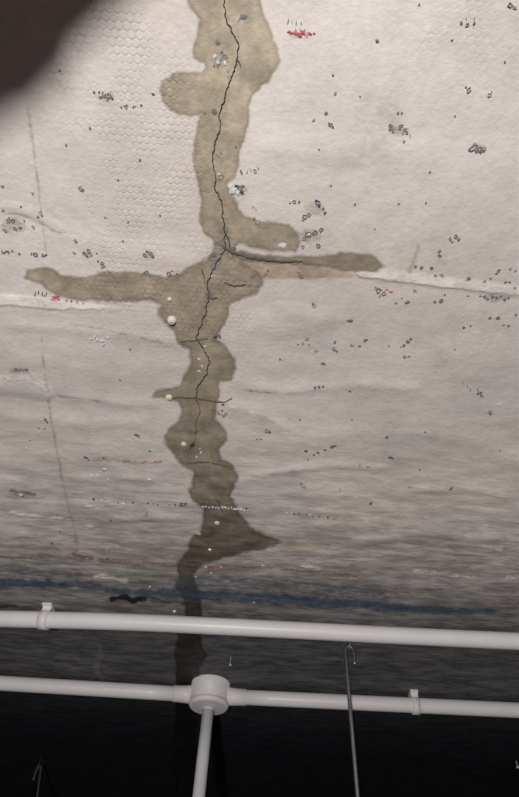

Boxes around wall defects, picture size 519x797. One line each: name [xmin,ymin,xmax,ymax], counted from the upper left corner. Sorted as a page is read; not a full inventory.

damp [25,0,383,617]
crack [172,0,303,466]
damp [173,702,198,797]
damp [175,633,206,685]